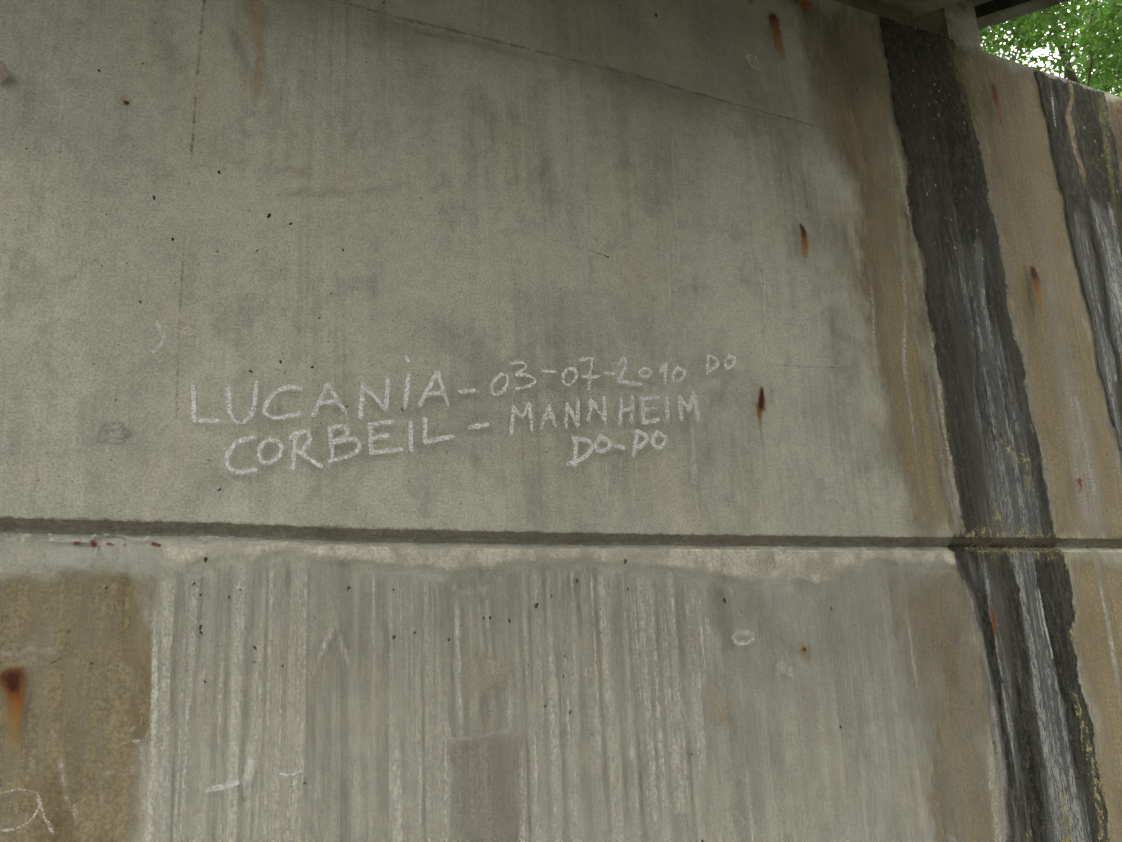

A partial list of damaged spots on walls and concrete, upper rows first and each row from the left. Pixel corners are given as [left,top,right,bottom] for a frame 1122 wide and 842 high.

rust [769,13,784,57]
rust [756,387,766,429]
rust [799,224,808,258]
leakage [804,13,956,532]
leakage [953,44,1122,842]
rust [0,666,25,747]
leakage [0,530,536,842]
leakage [519,548,1000,842]